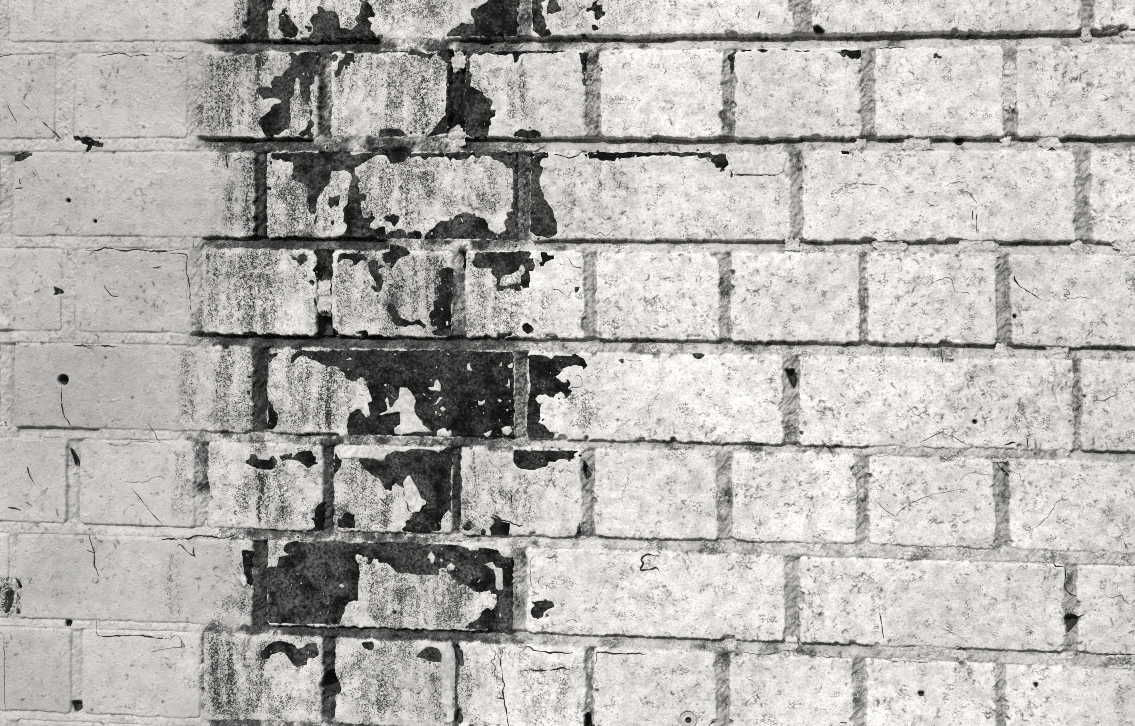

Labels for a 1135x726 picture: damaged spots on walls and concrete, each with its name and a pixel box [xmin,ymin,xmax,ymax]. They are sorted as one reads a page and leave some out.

peeling [242,0,787,633]
peeling [260,641,322,667]
peeling [416,647,442,664]